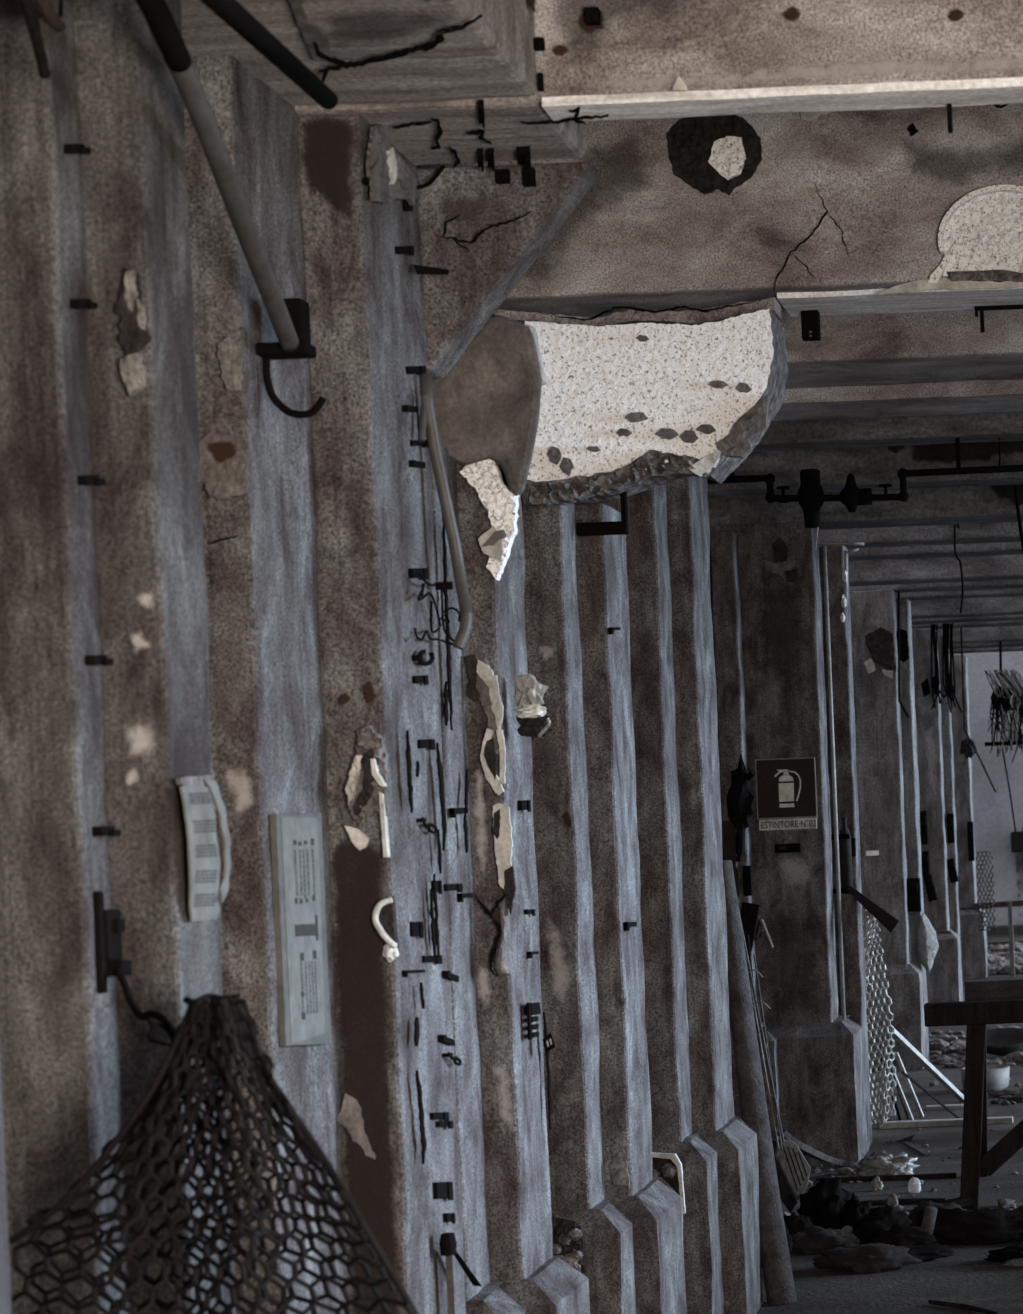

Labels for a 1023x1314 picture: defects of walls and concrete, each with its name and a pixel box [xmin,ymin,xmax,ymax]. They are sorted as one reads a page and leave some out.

crack [314,14,482,82]
peeling [366,124,421,205]
crack [392,118,491,169]
crack [520,106,609,125]
spalling [667,114,762,196]
crack [538,183,850,321]
peeling [115,267,153,396]
spalling [460,297,789,581]
spalling [345,725,391,857]
peeling [465,654,516,915]
peeling [337,1094,376,1159]
peeling [0,1178,9,1314]